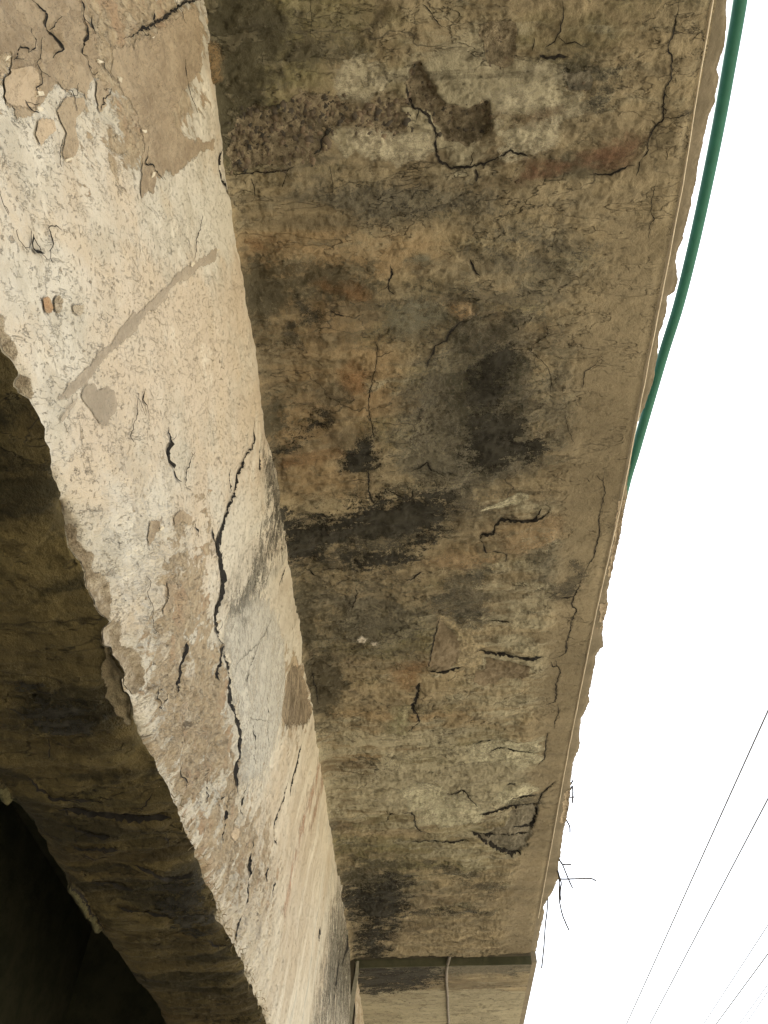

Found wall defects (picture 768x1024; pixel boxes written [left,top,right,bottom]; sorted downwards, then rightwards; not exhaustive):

crack [124,0,201,39]
peeling [0,0,494,198]
crack [406,88,529,182]
crack [590,2,691,237]
crack [166,430,195,490]
leakage [232,409,496,630]
leakage [457,343,550,475]
leakage [481,493,528,511]
crack [180,423,270,841]
crack [387,471,608,858]
spalling [476,803,539,852]
leakage [319,871,477,1024]